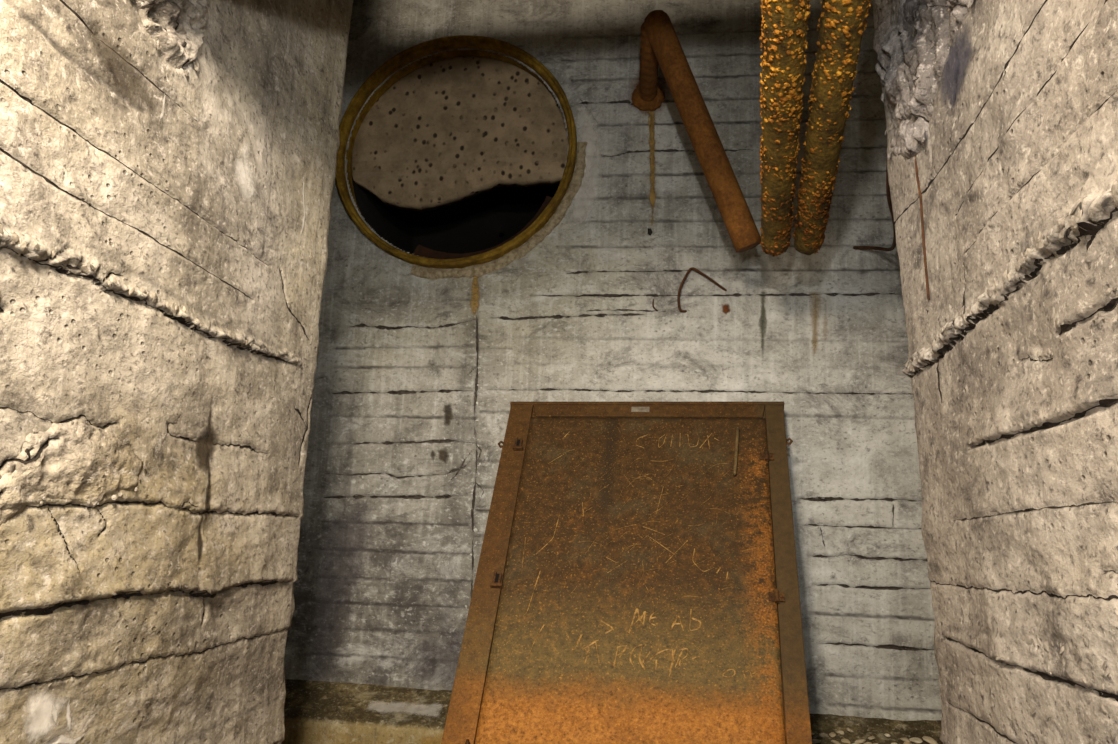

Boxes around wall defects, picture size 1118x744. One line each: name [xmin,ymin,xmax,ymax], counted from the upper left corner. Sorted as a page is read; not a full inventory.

crack [60,0,197,121]
spalling [873,0,975,159]
rust [645,79,665,221]
crack [0,79,309,365]
crack [295,0,1118,609]
crack [0,407,123,429]
crack [167,422,265,453]
crack [26,500,296,570]
crack [0,577,291,620]
crack [0,628,287,690]
crack [819,637,1118,702]
crack [948,702,1018,744]